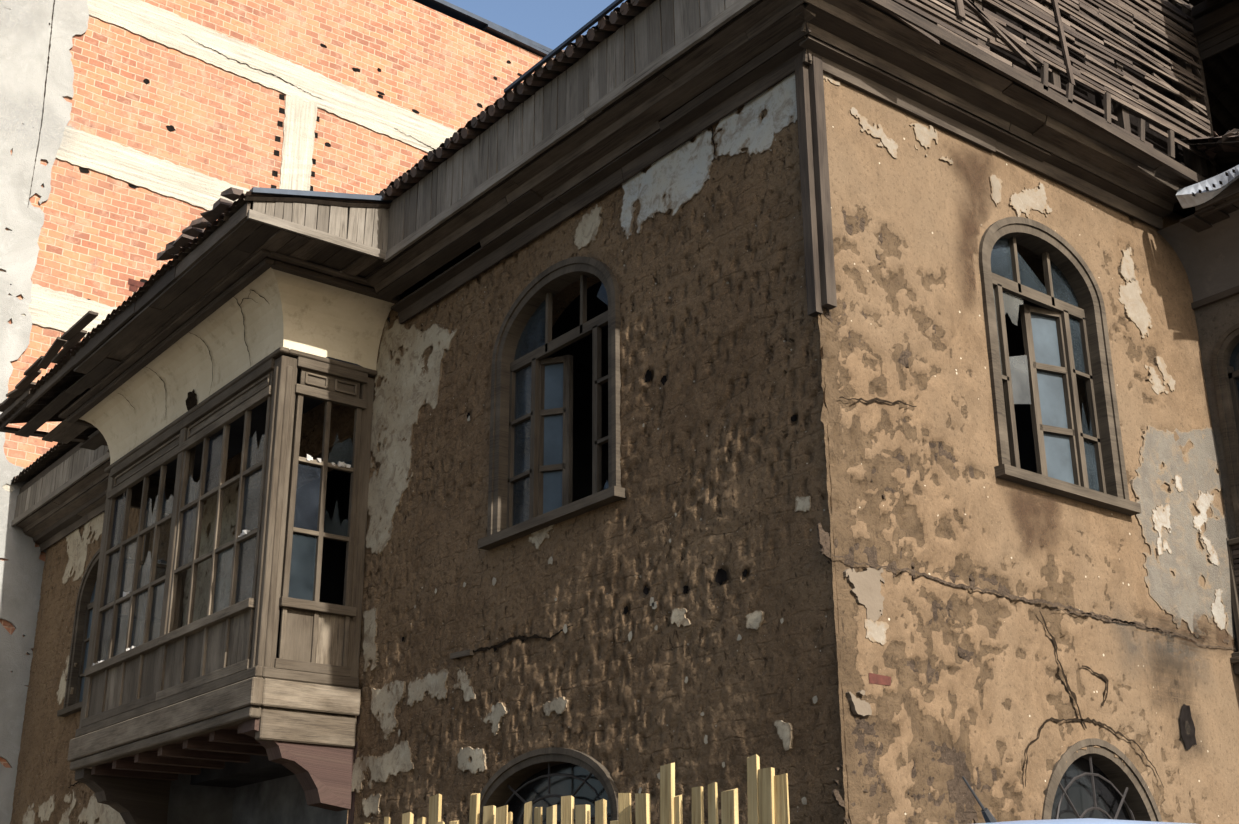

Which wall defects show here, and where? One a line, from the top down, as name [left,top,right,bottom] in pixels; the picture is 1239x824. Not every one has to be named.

spalling [915,0,968,34]
spalling [982,0,1041,78]
spalling [1051,0,1185,166]
spalling [128,278,148,293]
crack [234,290,268,367]
peeling [1152,504,1172,556]
peeling [1173,475,1220,566]
crack [456,625,573,659]
crack [827,552,1238,788]
peeling [1211,589,1226,630]